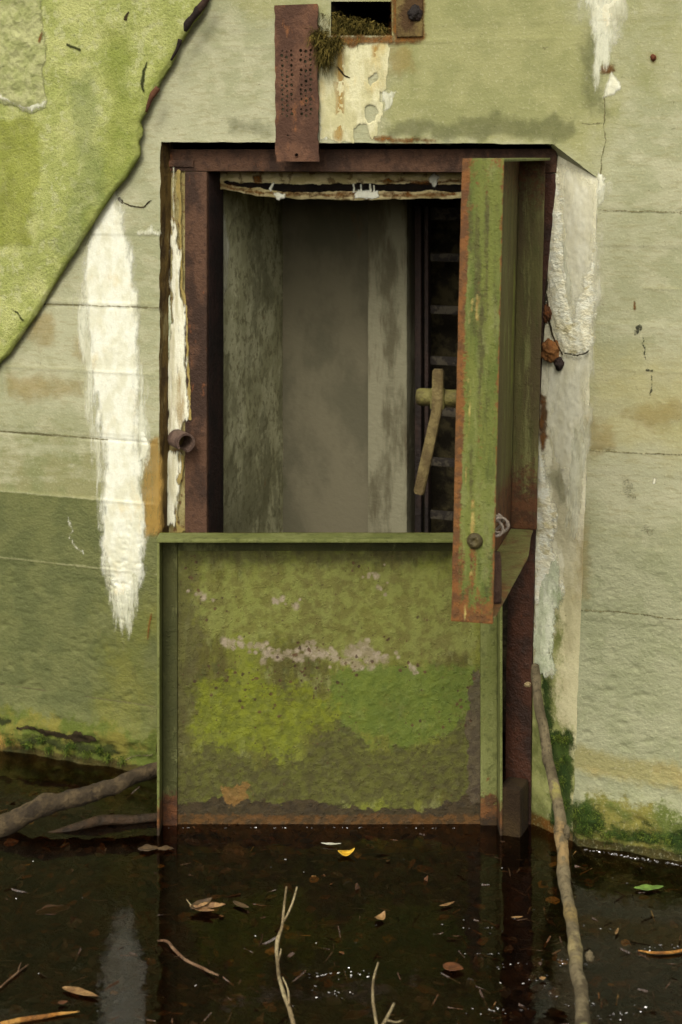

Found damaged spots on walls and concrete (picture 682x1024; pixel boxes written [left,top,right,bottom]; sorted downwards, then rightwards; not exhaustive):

spalling [0,0,47,114]
peeling [318,42,393,143]
crack [582,96,606,174]
damp [587,0,626,96]
corrosion [176,170,191,420]
damp [78,191,158,631]
damp [533,167,605,678]